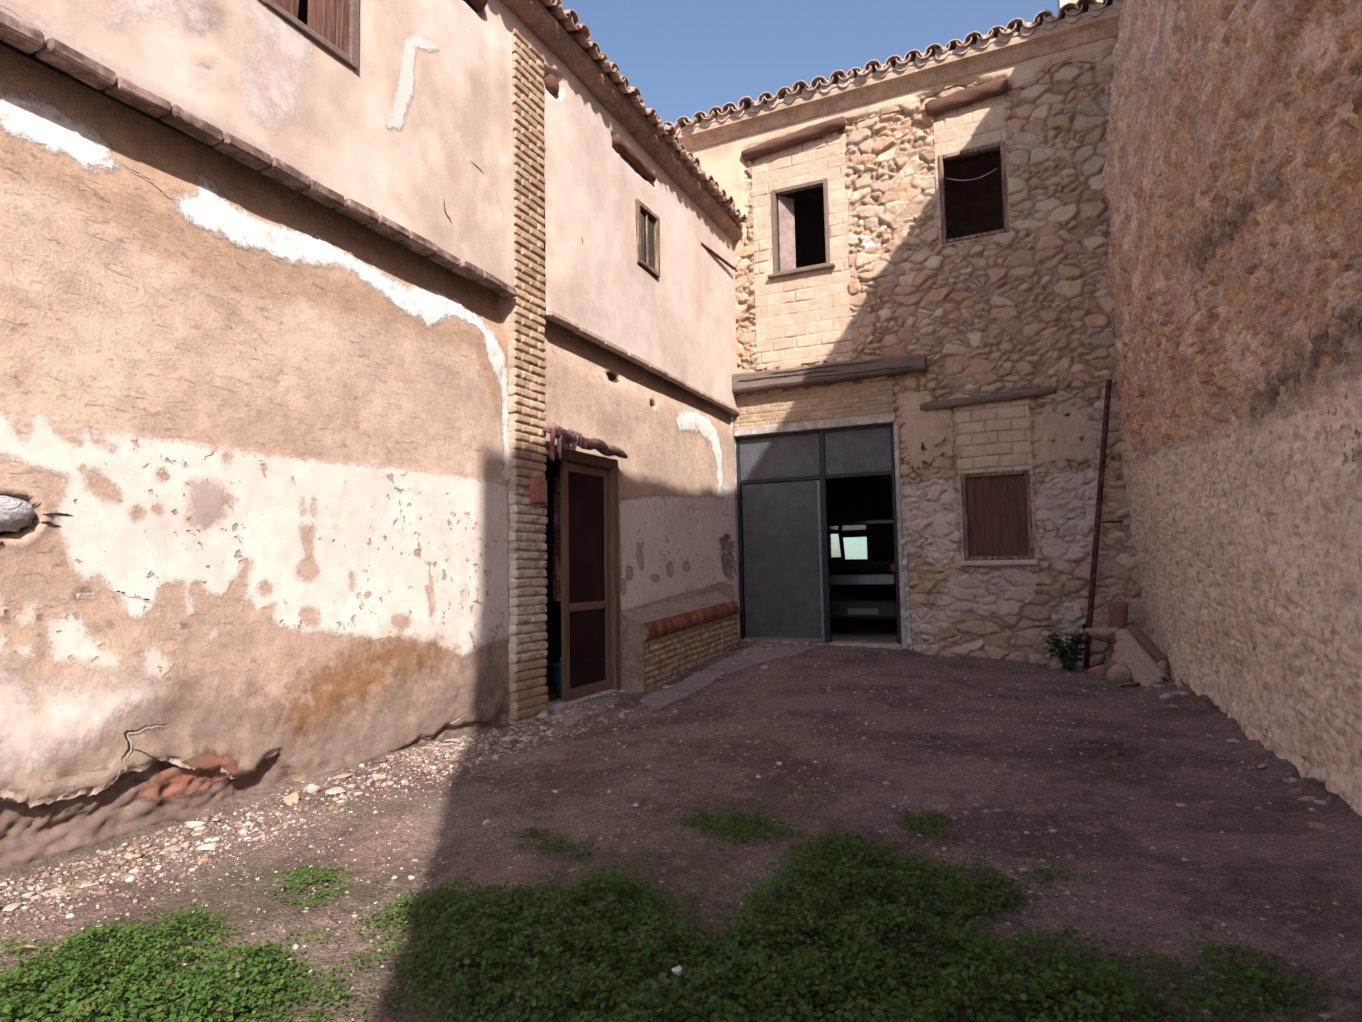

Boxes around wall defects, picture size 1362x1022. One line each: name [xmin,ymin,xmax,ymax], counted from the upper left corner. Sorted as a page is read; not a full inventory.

peeling [0,410,510,672]
peeling [619,485,739,640]
peeling [138,646,174,682]
spalling [407,708,507,746]
spalling [0,749,292,868]